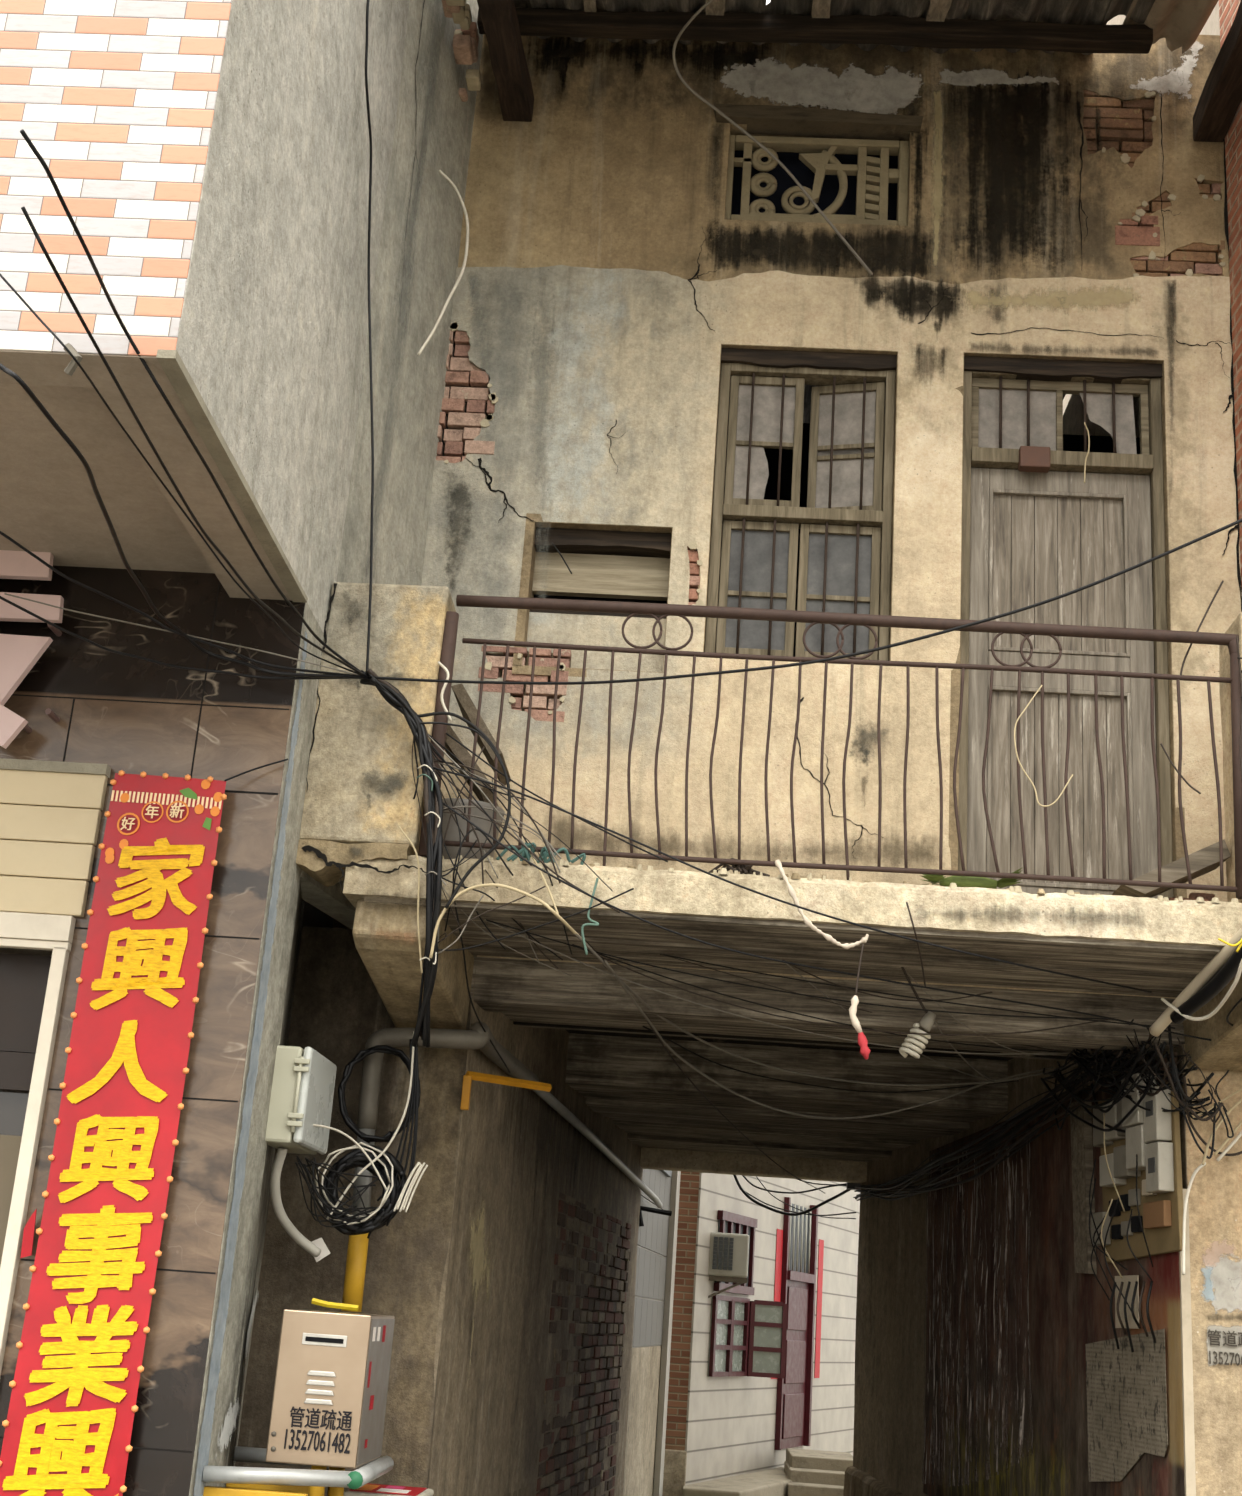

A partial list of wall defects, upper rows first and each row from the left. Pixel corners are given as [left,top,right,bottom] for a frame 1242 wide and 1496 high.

spalling [442,0,481,102]
water stain [528,37,768,91]
peeling [720,57,1059,115]
spalling [1083,41,1205,168]
water stain [706,72,1080,331]
spalling [967,191,1225,309]
water stain [973,345,1078,354]
spalling [436,322,498,464]
crack [466,458,534,523]
spalling [478,646,572,722]
crack [301,845,426,888]
peeling [1202,1253,1242,1314]